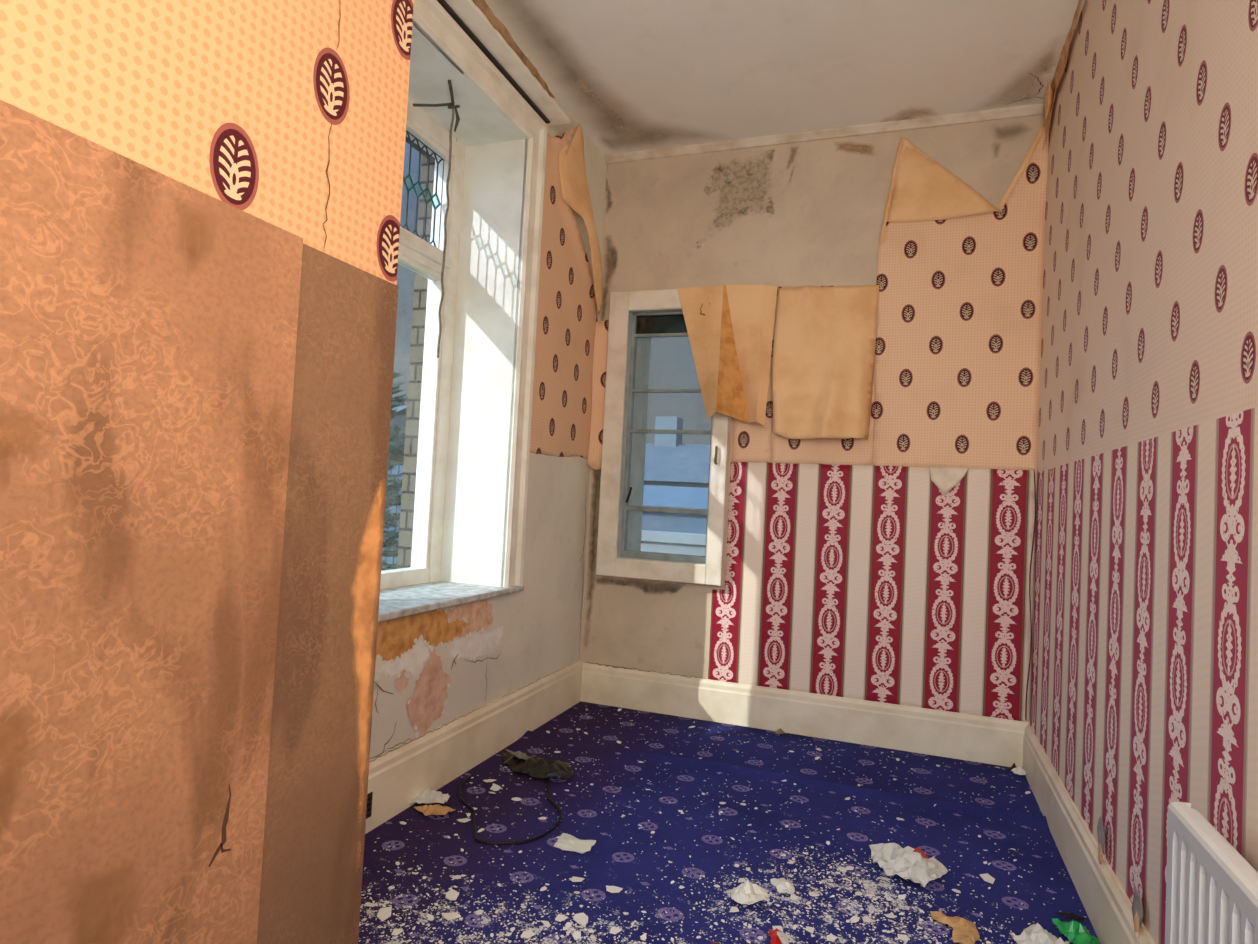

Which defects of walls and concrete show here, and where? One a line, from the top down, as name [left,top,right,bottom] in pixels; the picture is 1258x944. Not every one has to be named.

crack [323,123,332,247]
spalling [374,599,503,738]
crack [208,784,231,867]